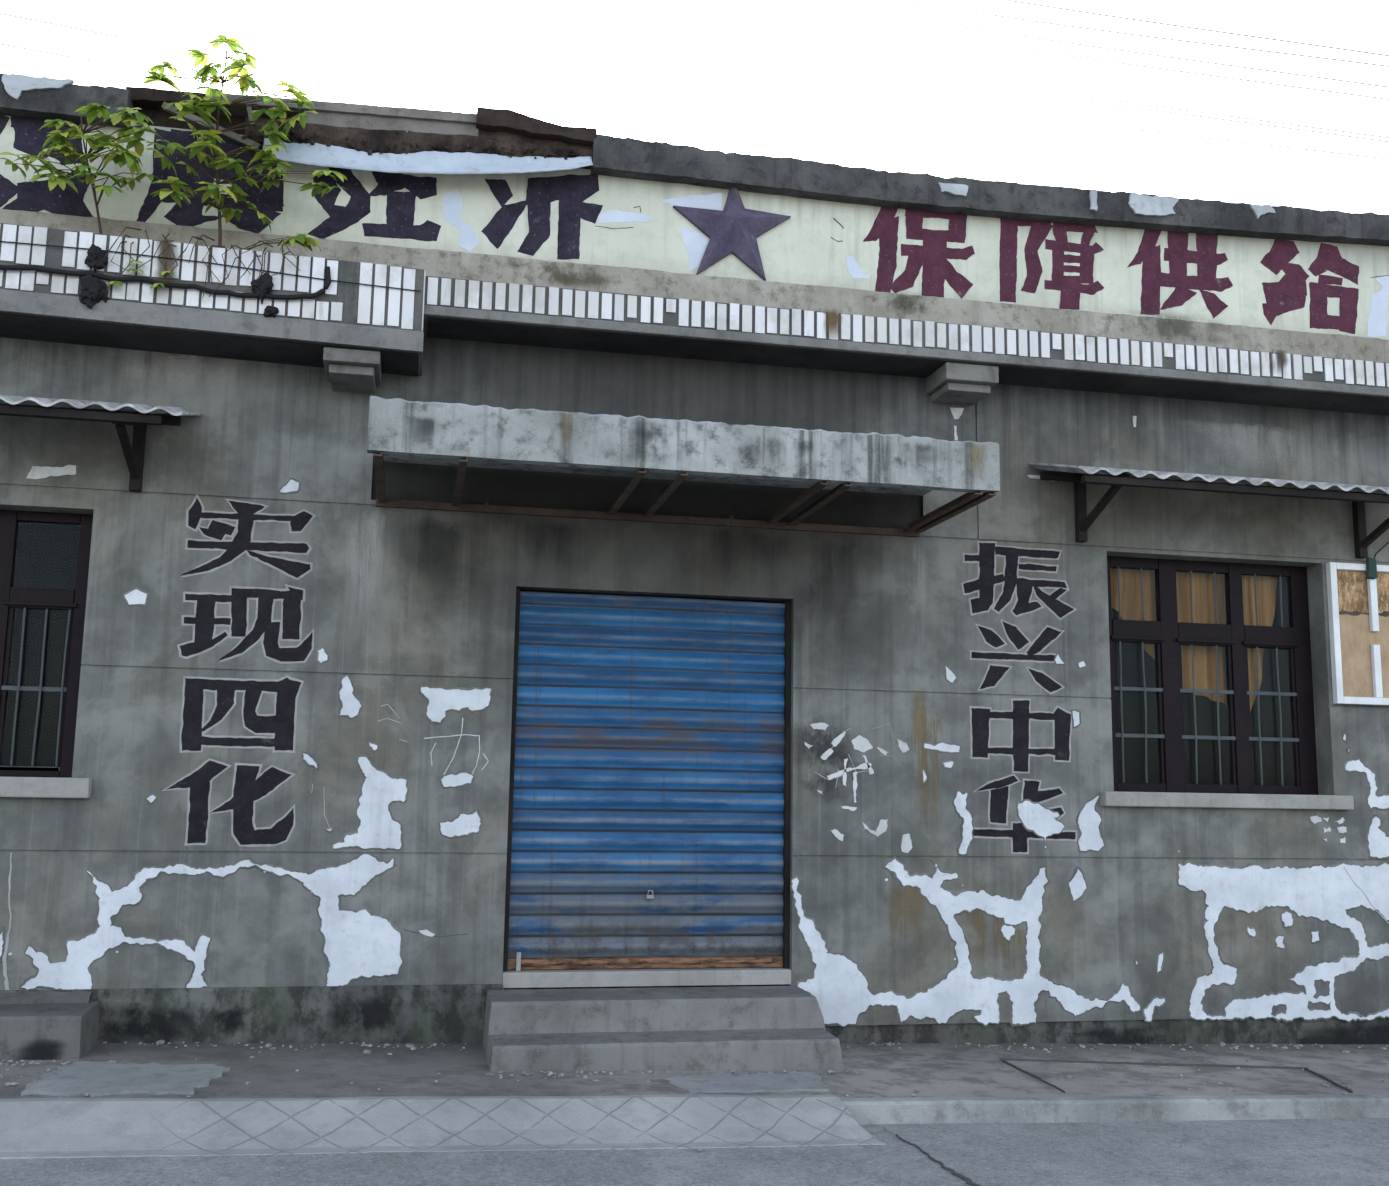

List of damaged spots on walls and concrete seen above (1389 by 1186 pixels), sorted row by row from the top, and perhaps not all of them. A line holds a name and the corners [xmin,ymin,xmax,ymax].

spalling [2,73,74,100]
flaking render [123,587,150,606]
flaking render [316,646,329,665]
flaking render [338,675,363,719]
flaking render [419,685,492,725]
flaking render [1071,709,1081,728]
flaking render [439,770,475,789]
flaking render [439,809,483,839]
flaking render [0,741,435,990]
flaking render [790,723,1167,1028]
flaking render [1177,732,1389,1023]